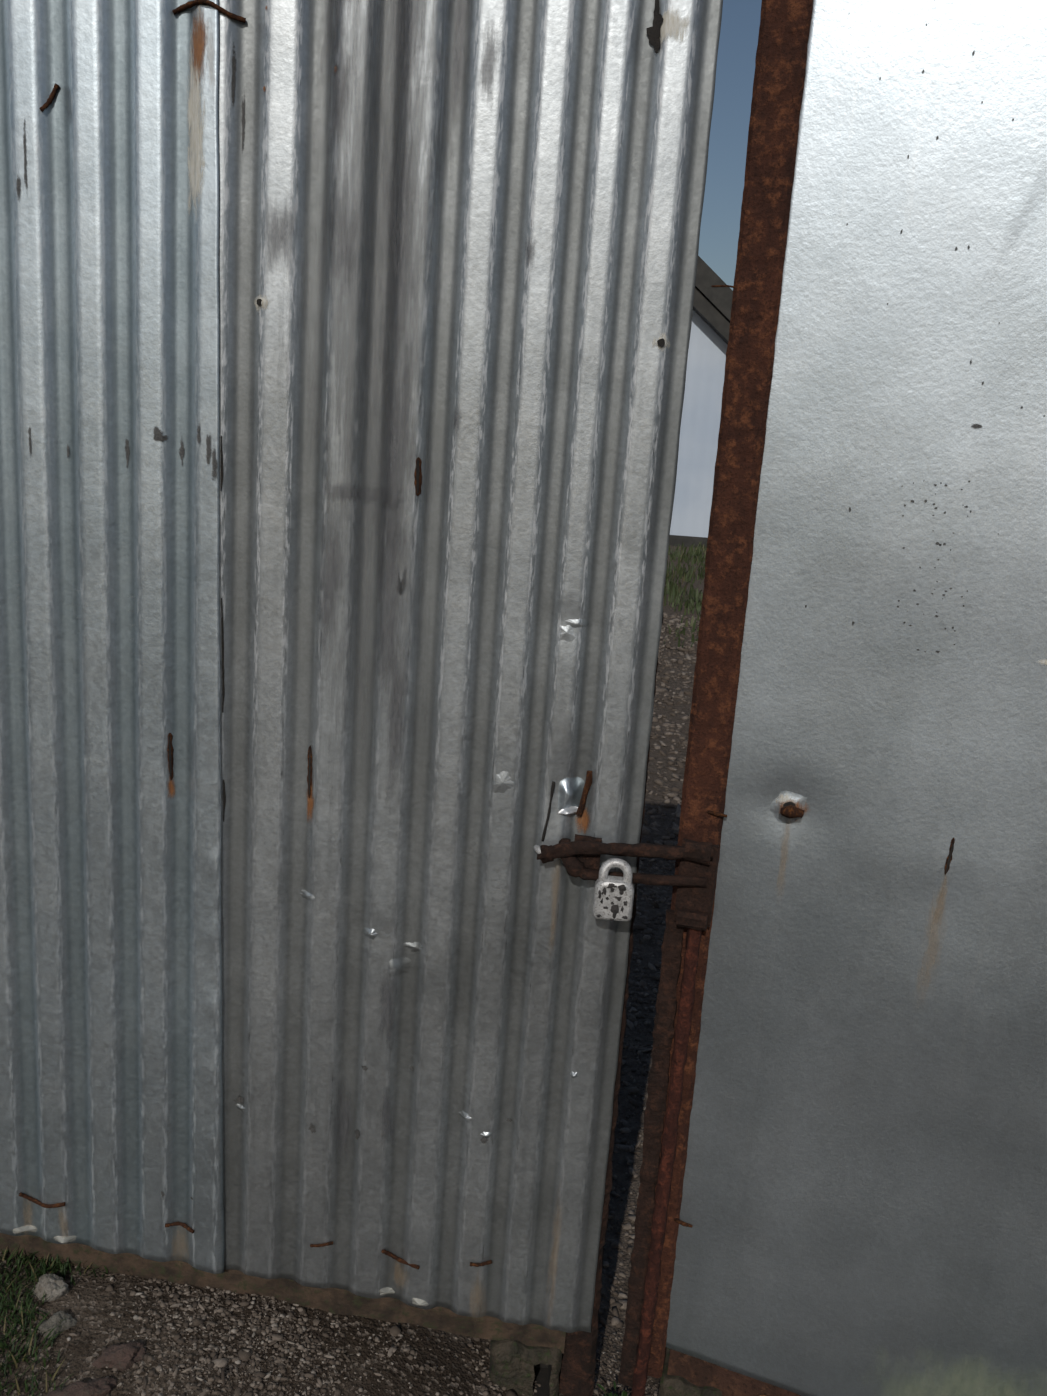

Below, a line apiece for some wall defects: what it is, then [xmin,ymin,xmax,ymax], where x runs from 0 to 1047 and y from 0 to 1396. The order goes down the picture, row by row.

corrosion [188,17,205,204]
water stain [332,66,346,132]
water stain [394,0,418,86]
water stain [482,42,494,88]
water stain [390,152,409,321]
corrosion [414,457,422,496]
water stain [339,379,407,765]
corrosion [576,770,592,832]